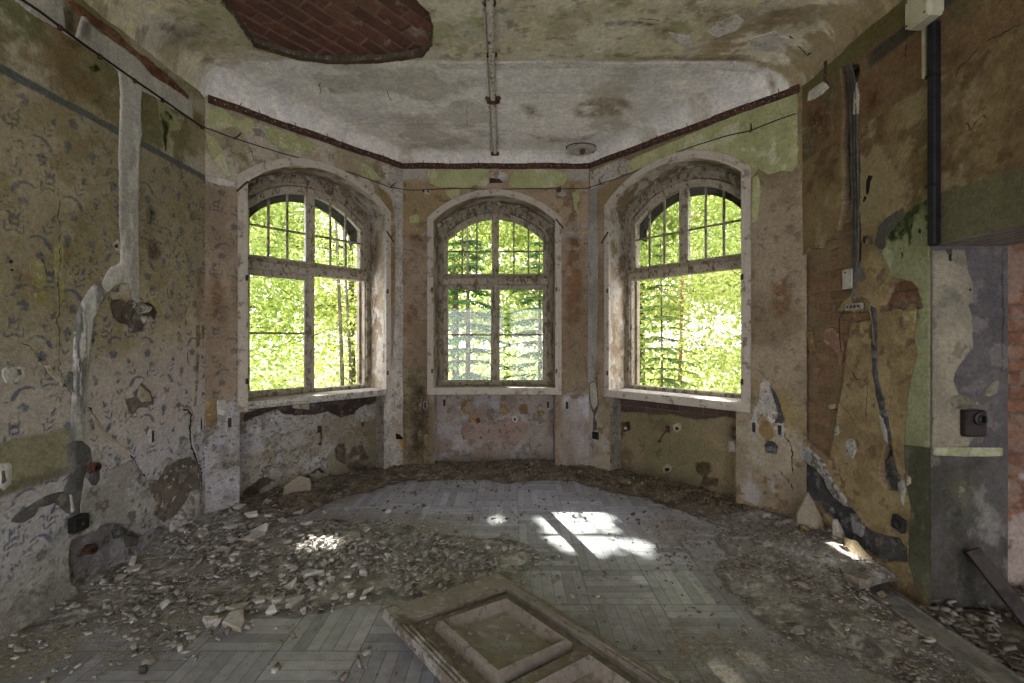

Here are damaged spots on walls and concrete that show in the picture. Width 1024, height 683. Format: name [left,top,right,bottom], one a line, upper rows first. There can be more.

flaking render [227,0,433,65]
flaking render [110,300,157,332]
flaking render [125,383,154,415]
crack [183,405,202,492]
flaking render [197,396,376,438]
flaking render [749,419,786,454]
peeling [807,170,999,603]
flaking render [69,457,203,587]